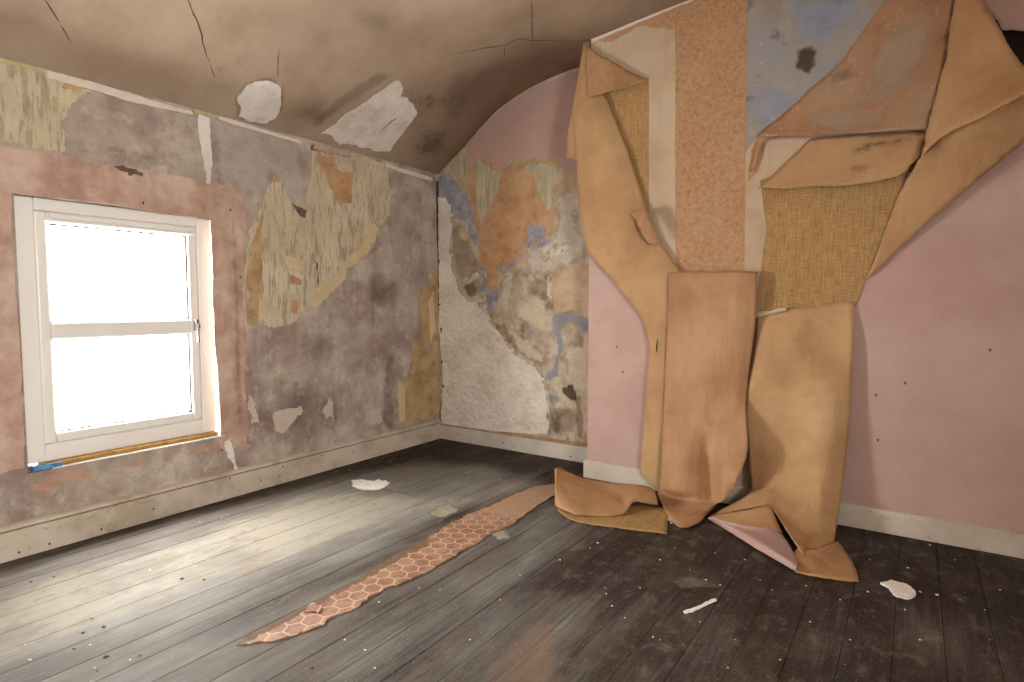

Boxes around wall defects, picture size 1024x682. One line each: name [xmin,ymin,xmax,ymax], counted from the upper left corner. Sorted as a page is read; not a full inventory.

crack [45,0,72,43]
crack [188,1,215,77]
crack [442,0,575,57]
peeling [996,20,1024,65]
peeling [62,79,87,93]
peeling [592,0,930,325]
flaking render [0,146,260,474]
flaking render [428,173,589,434]
peeling [273,406,303,434]
peeling [322,398,334,424]